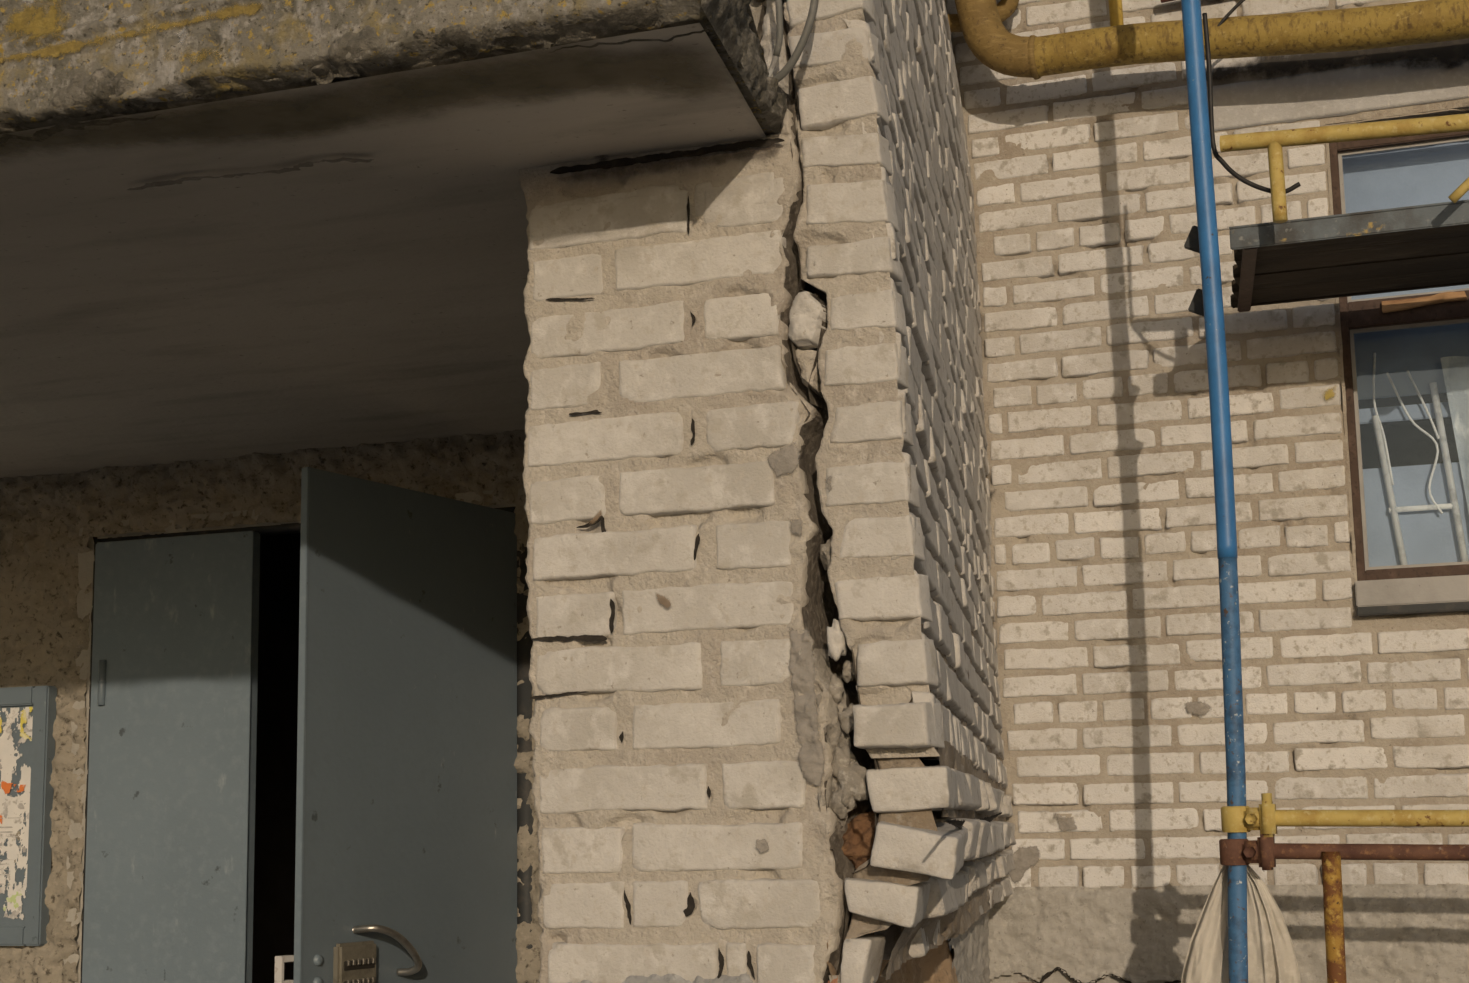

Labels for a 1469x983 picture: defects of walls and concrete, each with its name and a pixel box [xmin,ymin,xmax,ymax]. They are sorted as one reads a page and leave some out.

water stain [0,53,720,157]
crack [754,0,879,983]
spalling [825,926,874,983]
spalling [870,940,959,983]
crack [1027,967,1181,983]